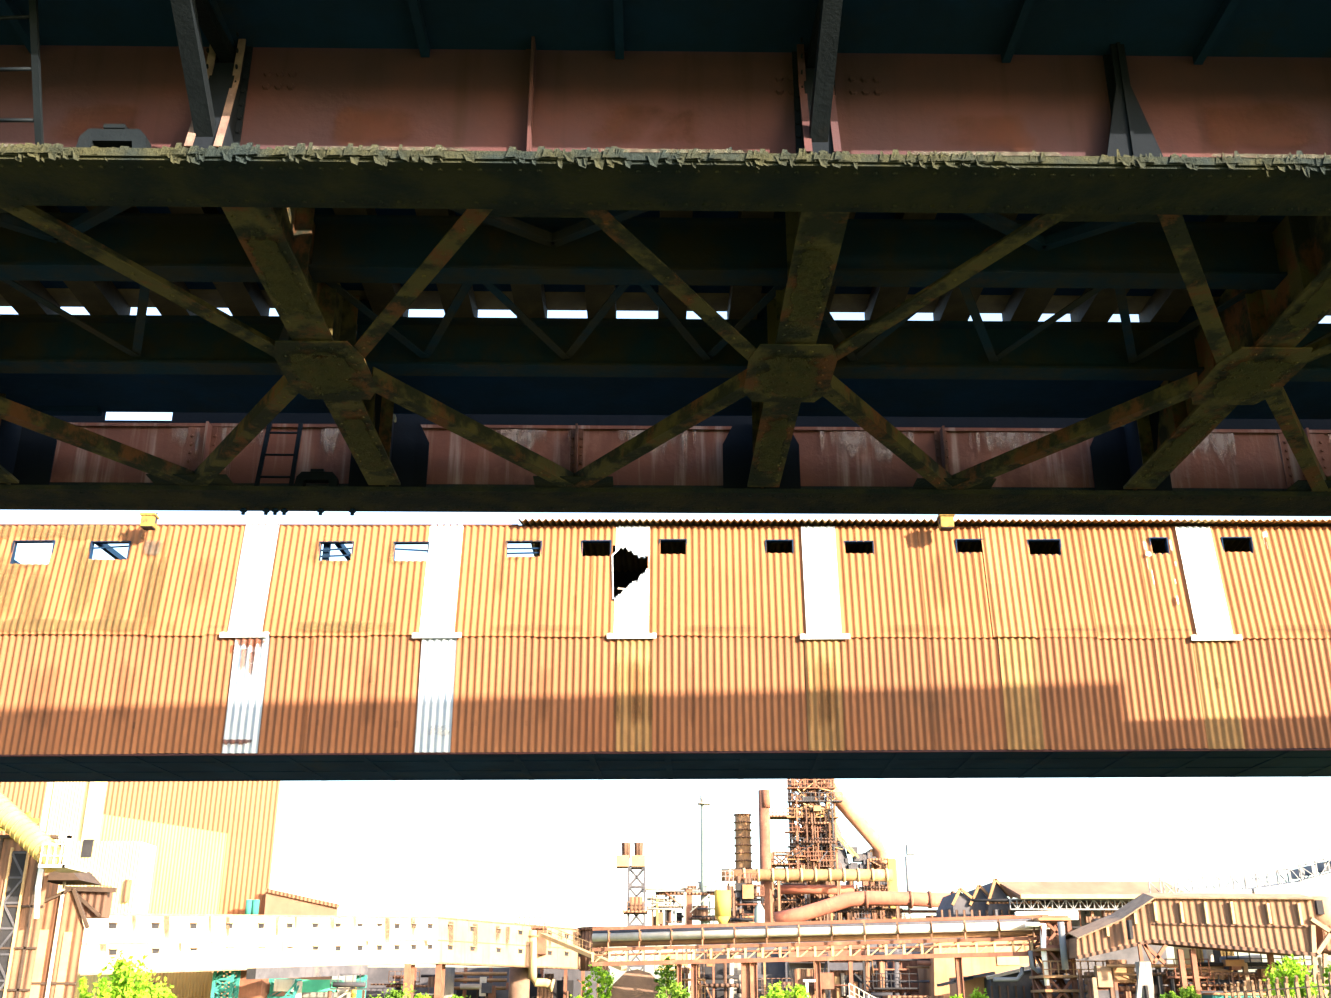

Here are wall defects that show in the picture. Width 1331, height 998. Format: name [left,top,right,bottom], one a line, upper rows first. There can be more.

water stain [0,525,166,631]